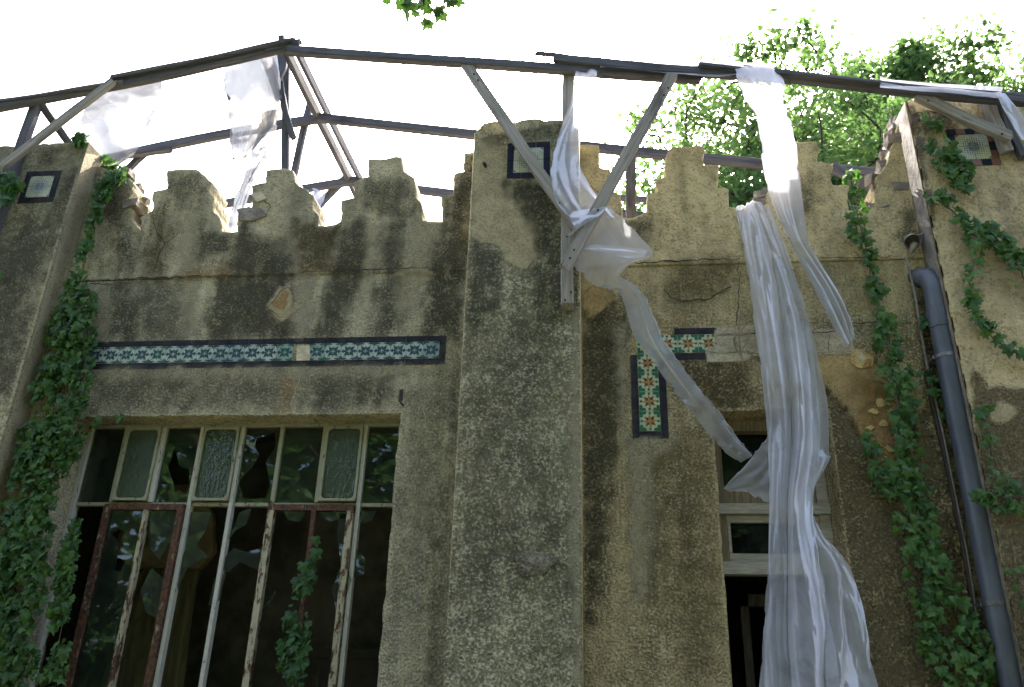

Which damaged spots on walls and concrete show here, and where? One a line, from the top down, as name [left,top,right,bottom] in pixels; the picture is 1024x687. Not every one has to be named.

crack [81,214,461,285]
leakage [90,167,500,340]
flaking render [267,284,293,322]
leakage [504,181,670,601]
crack [637,258,758,354]
peeling [706,325,759,362]
peeling [812,328,927,469]